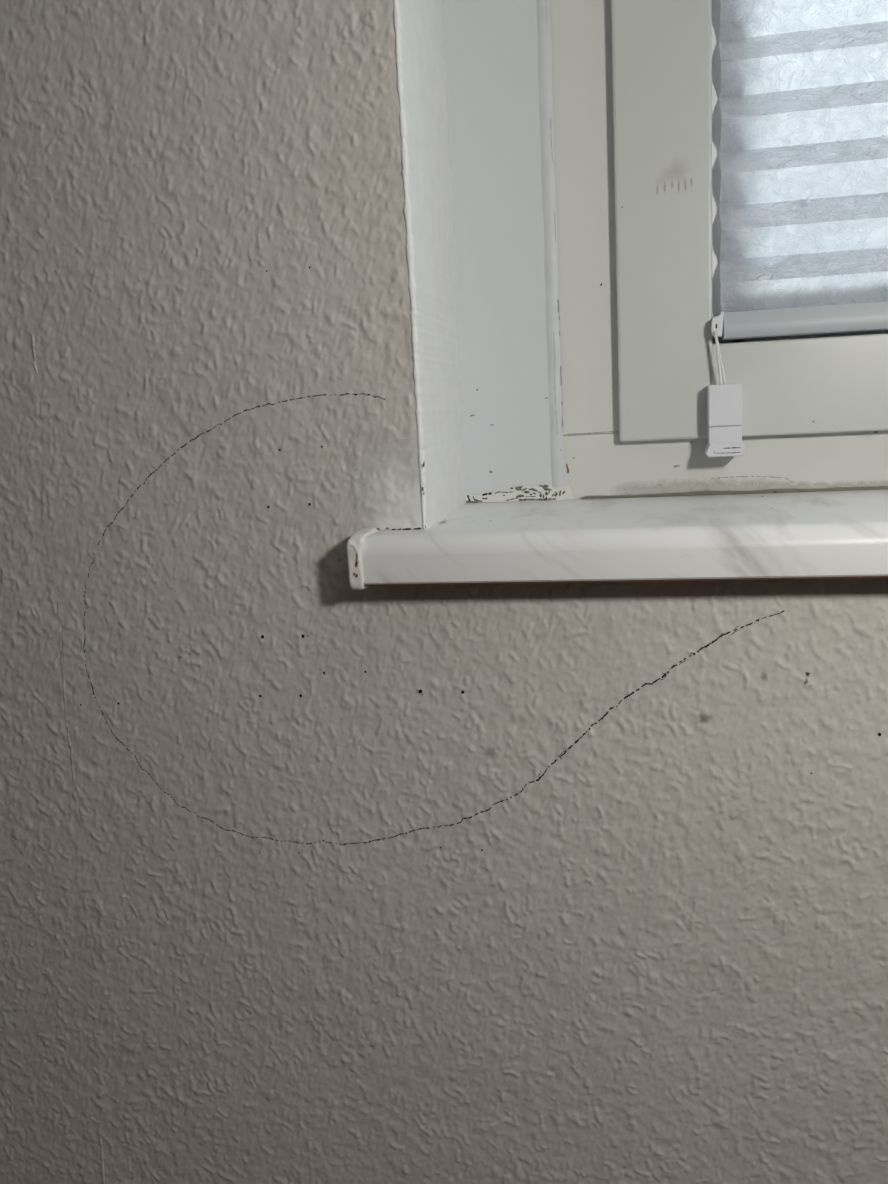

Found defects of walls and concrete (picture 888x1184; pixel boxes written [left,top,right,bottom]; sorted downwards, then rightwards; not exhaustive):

crack [84,393,784,845]